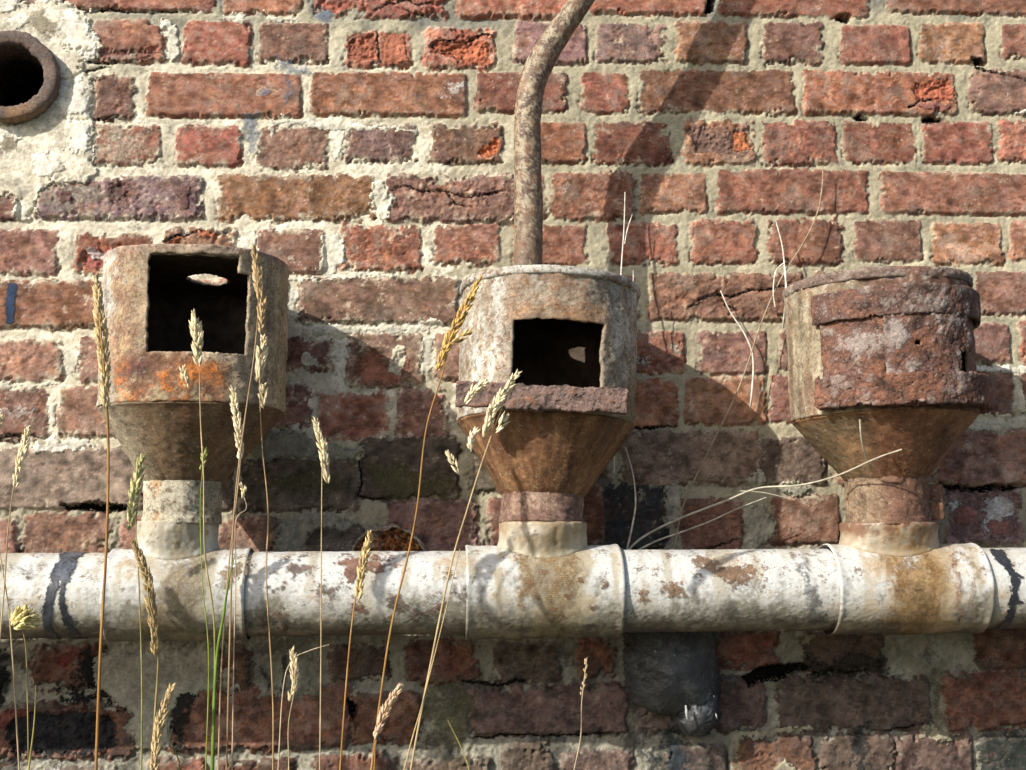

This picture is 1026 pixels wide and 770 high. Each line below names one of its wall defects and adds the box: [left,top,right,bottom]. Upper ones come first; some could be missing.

crack [375,0,431,63]
spalling [430,28,491,68]
crack [974,67,1025,79]
peeling [0,0,163,222]
crack [908,86,954,108]
crack [392,184,501,207]
crack [166,229,231,242]
leakage [981,495,1018,543]